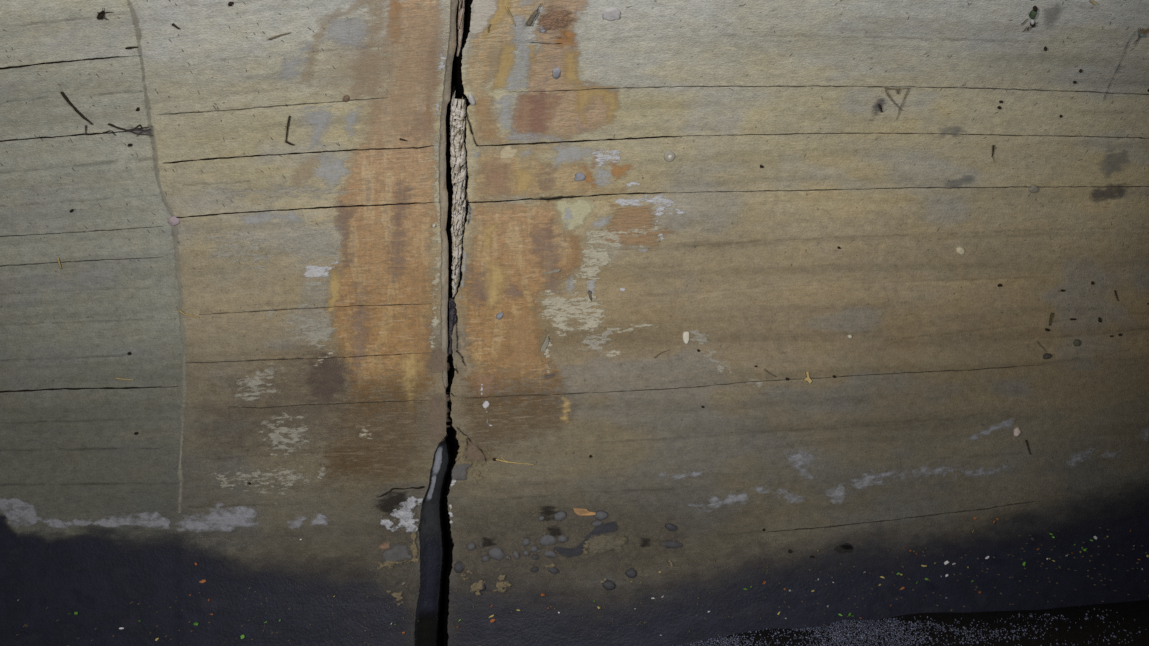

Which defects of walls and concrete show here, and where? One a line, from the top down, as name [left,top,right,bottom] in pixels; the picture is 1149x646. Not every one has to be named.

crack [165,145,434,163]
corrosion [328,0,443,404]
corrosion [459,0,673,420]
damp [536,181,687,374]
crack [199,304,420,315]
crack [436,0,1149,646]
crack [191,353,412,363]
damp [229,363,276,400]
damp [260,415,309,455]
damp [215,468,325,494]
crack [379,486,424,497]
damp [0,498,415,646]